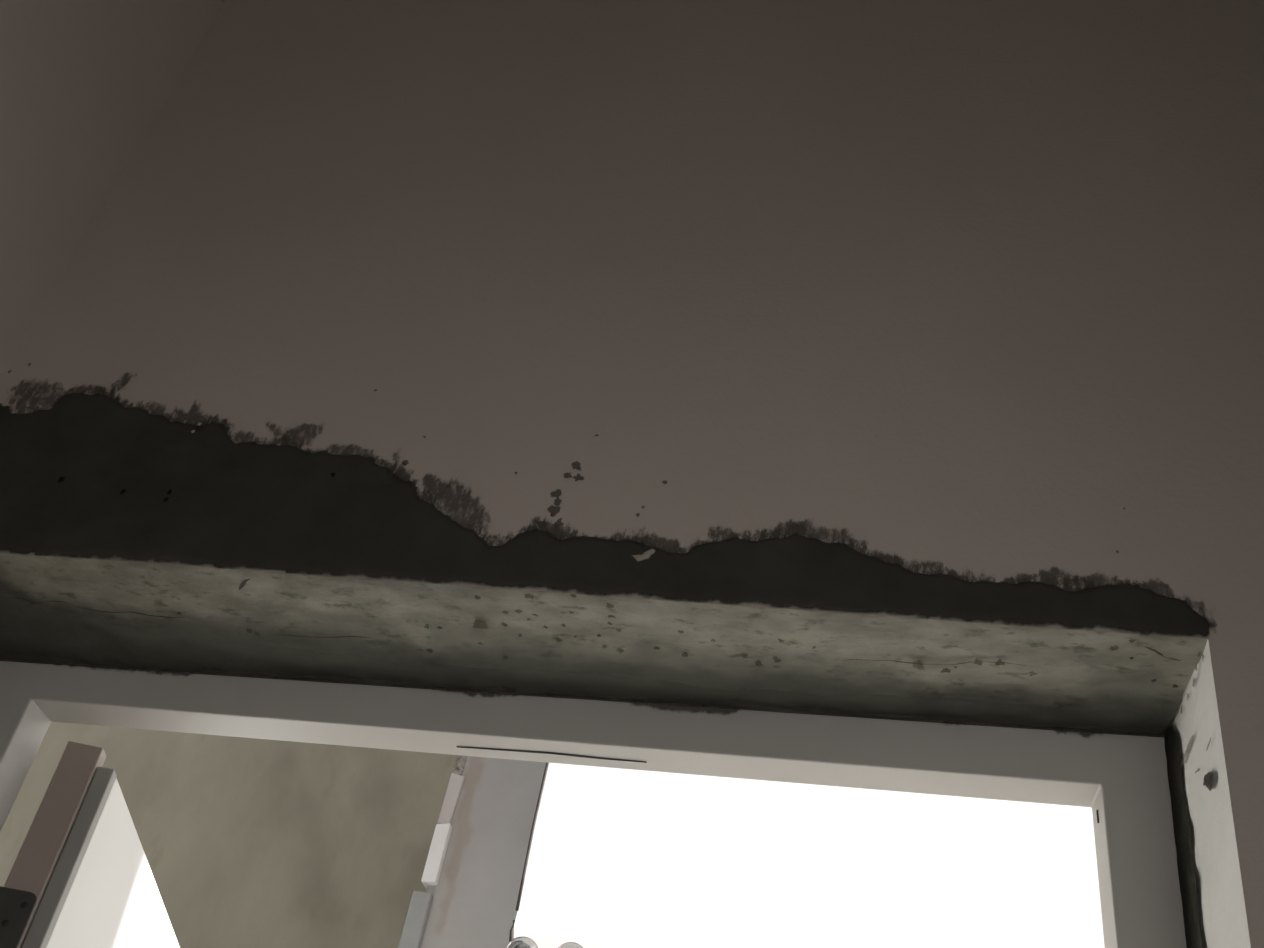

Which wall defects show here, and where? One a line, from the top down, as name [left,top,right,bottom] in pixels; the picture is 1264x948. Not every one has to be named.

peeling [631,548,655,561]
spalling [473,594,577,645]